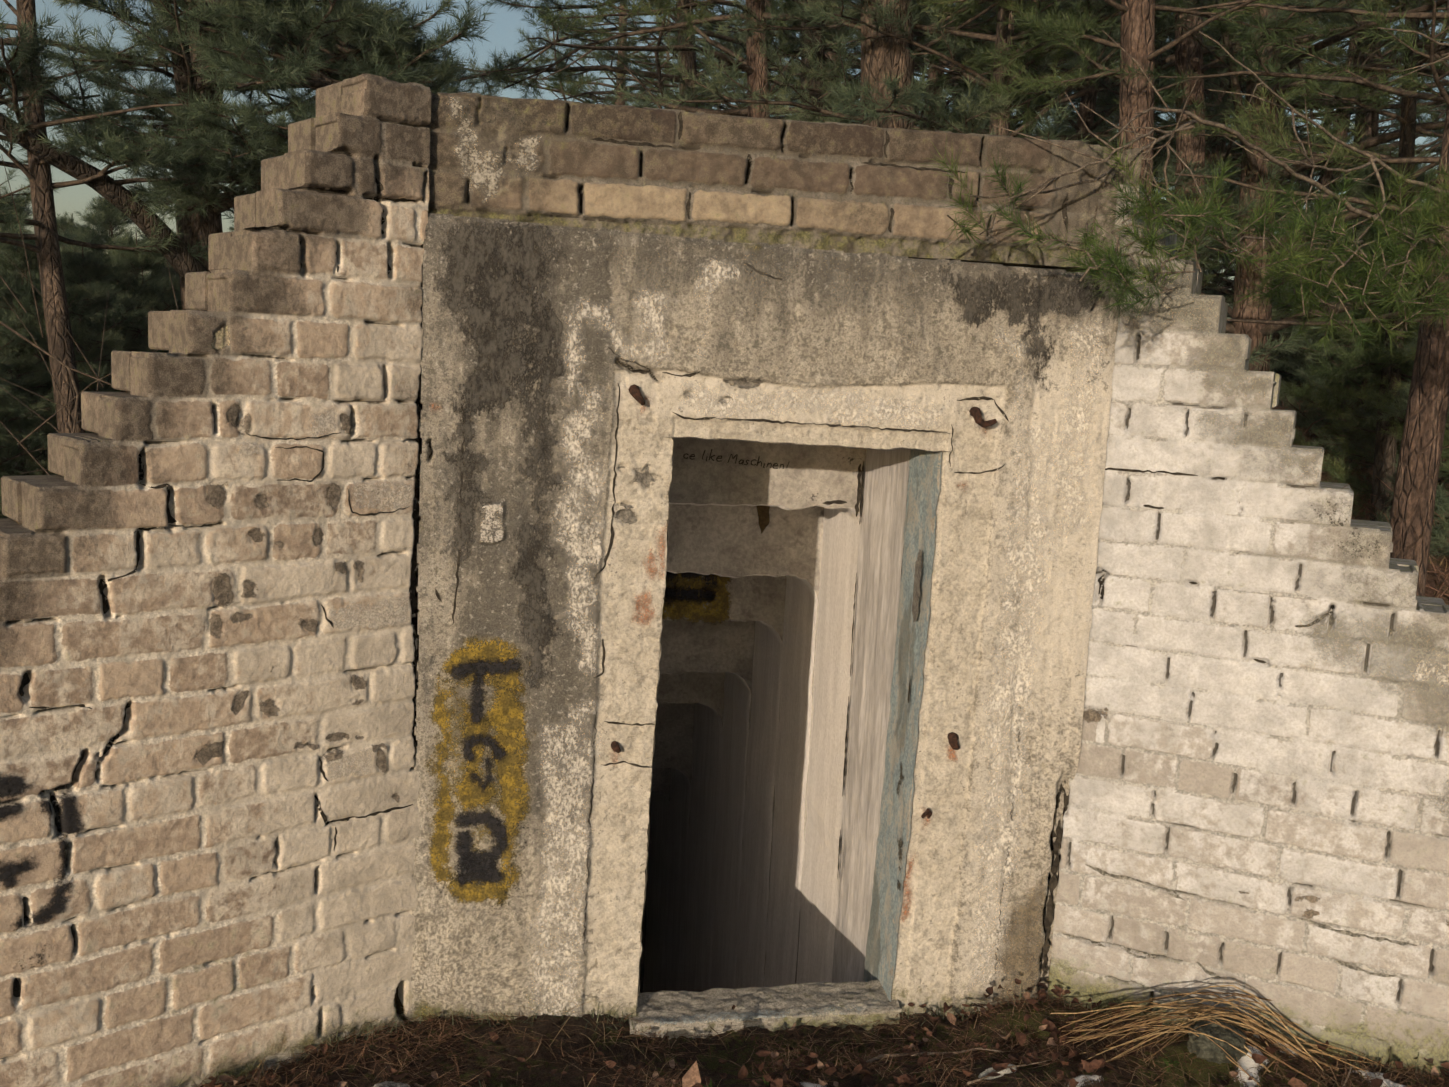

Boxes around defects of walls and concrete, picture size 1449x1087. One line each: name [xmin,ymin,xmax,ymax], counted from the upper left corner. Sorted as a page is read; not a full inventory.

crack [19,672,131,827]
crack [98,453,177,614]
damp [481,708,600,1016]
damp [425,218,668,690]
crack [594,639,605,678]
crack [583,712,655,954]
crack [594,346,700,580]
crack [673,396,1009,524]
crack [837,573,857,879]
crack [995,706,1021,974]
damp [940,263,1109,1001]
crack [1040,781,1184,977]